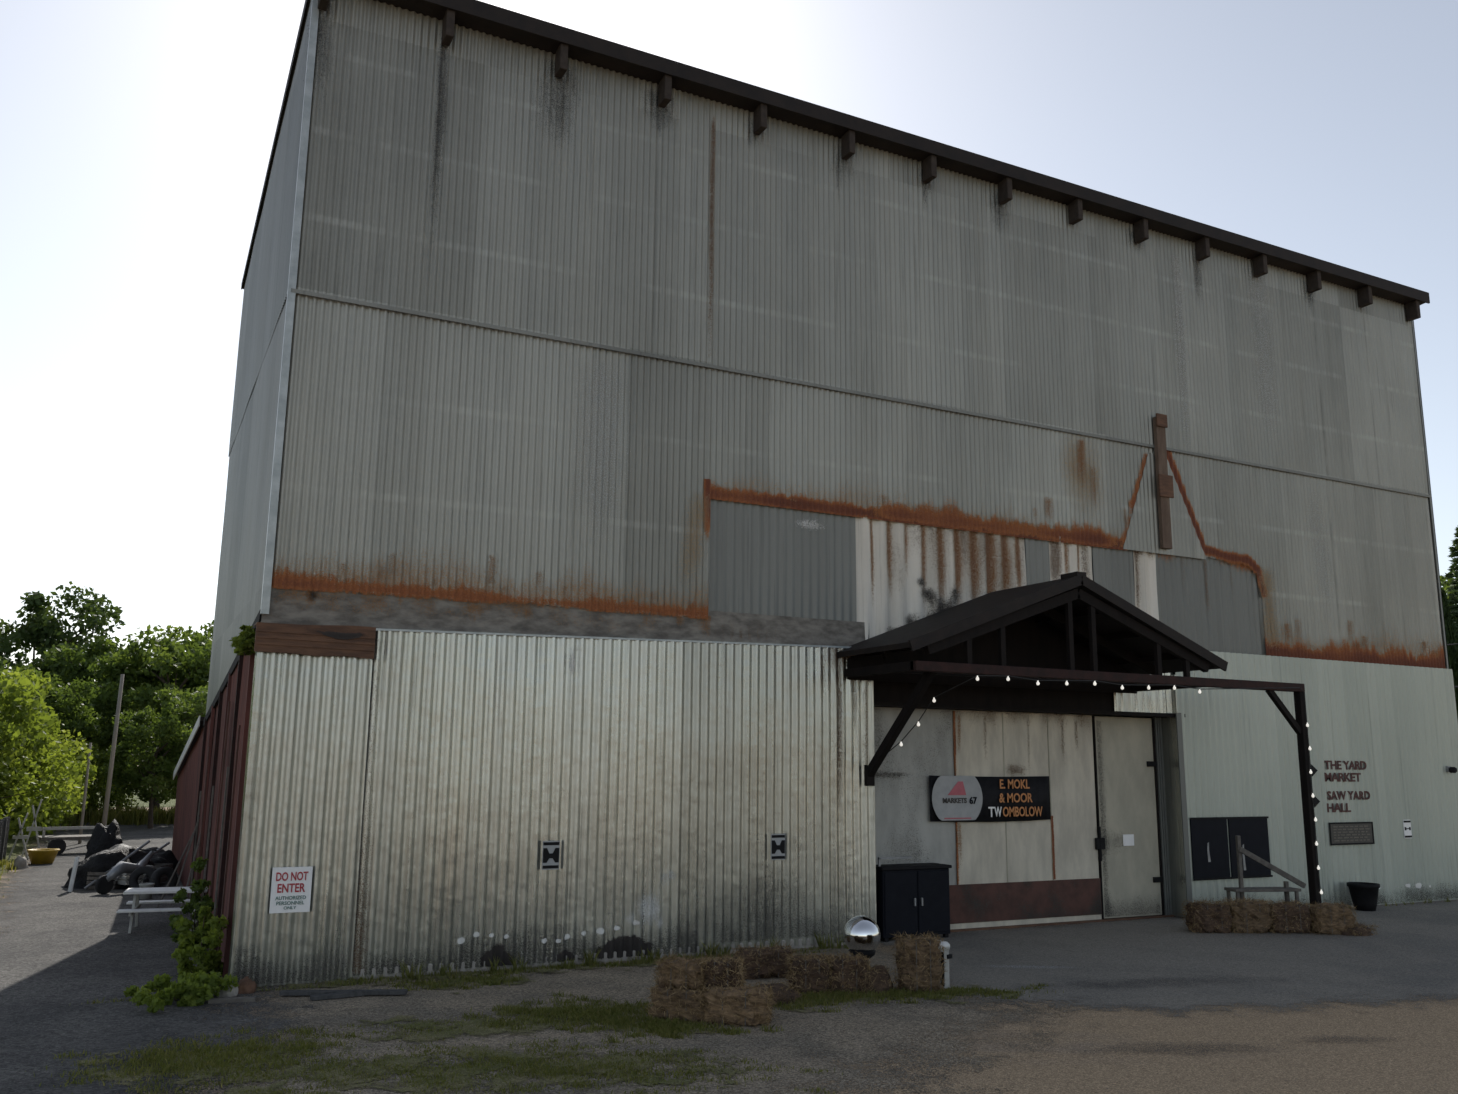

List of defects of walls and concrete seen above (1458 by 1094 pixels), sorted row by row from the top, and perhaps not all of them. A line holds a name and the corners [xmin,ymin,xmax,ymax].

rust [271,453,1186,619]
rust [1167,450,1446,669]